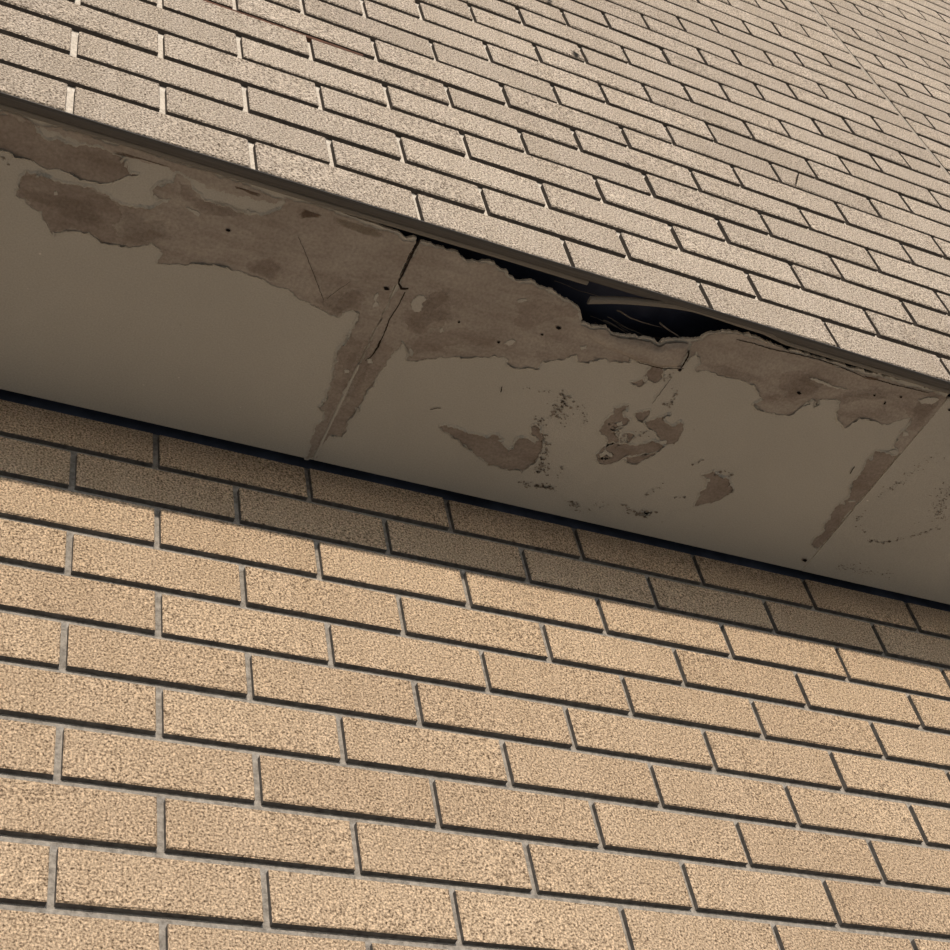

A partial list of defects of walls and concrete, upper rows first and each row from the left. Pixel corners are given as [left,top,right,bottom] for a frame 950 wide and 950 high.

crack [365,239,421,361]
peeling [0,111,950,549]